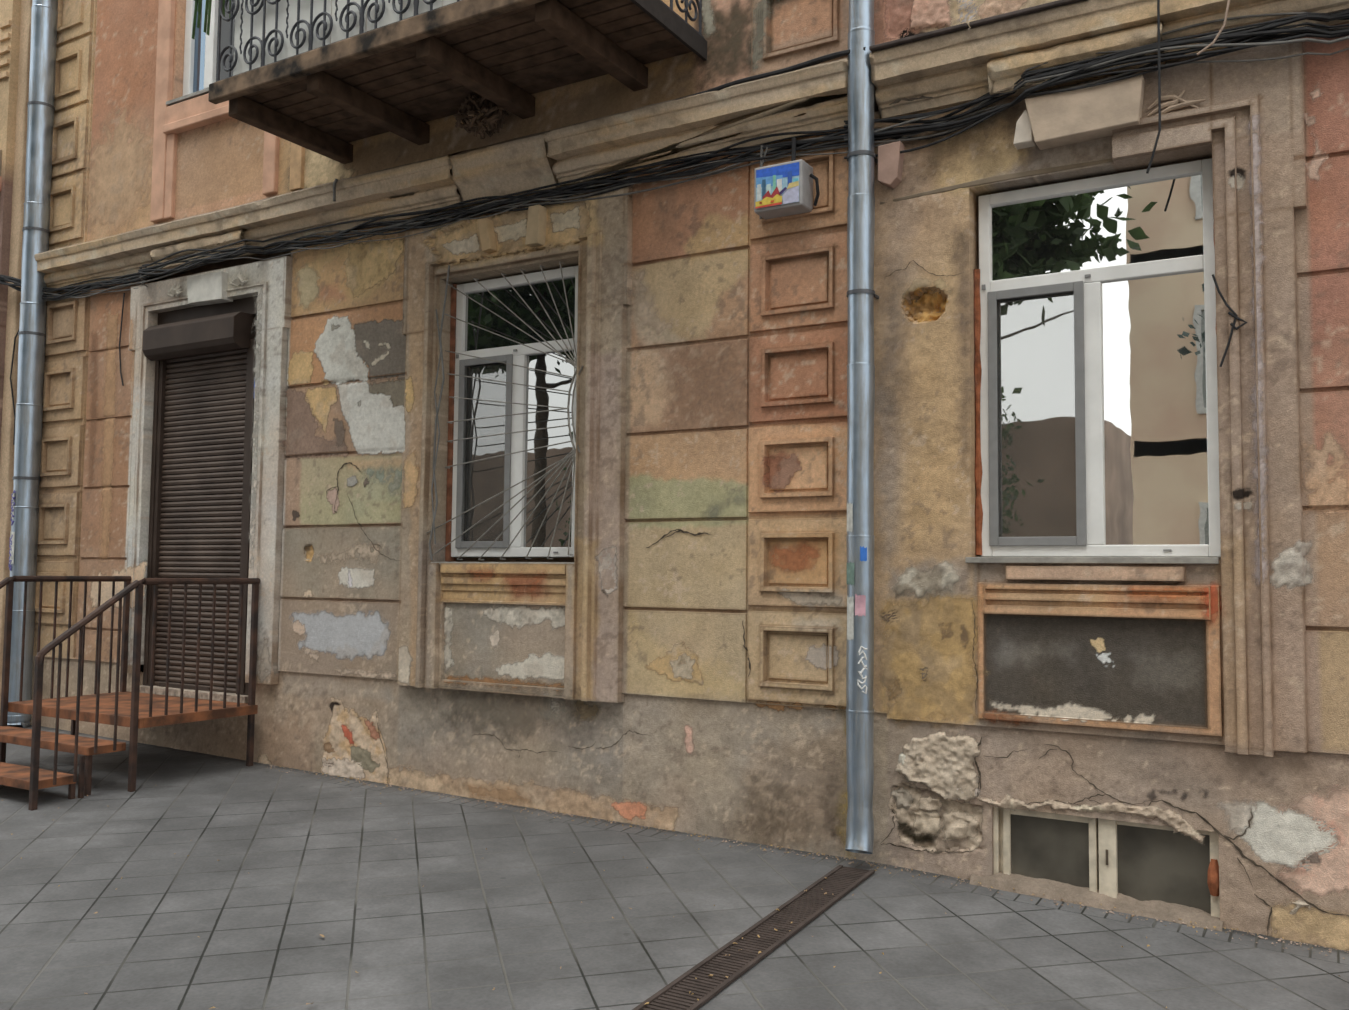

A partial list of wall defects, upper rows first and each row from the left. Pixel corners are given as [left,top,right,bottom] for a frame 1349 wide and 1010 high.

flaking render [884,0,1057,39]
peeling [280,316,419,514]
peeling [1229,115,1313,588]
crack [646,529,711,548]
peeling [292,590,412,685]
peeling [321,697,678,830]
peeling [484,605,565,647]
peeling [495,652,564,680]
crack [971,605,979,705]
flaking render [880,561,1205,854]
crack [974,737,1348,936]
peeling [1220,788,1349,950]